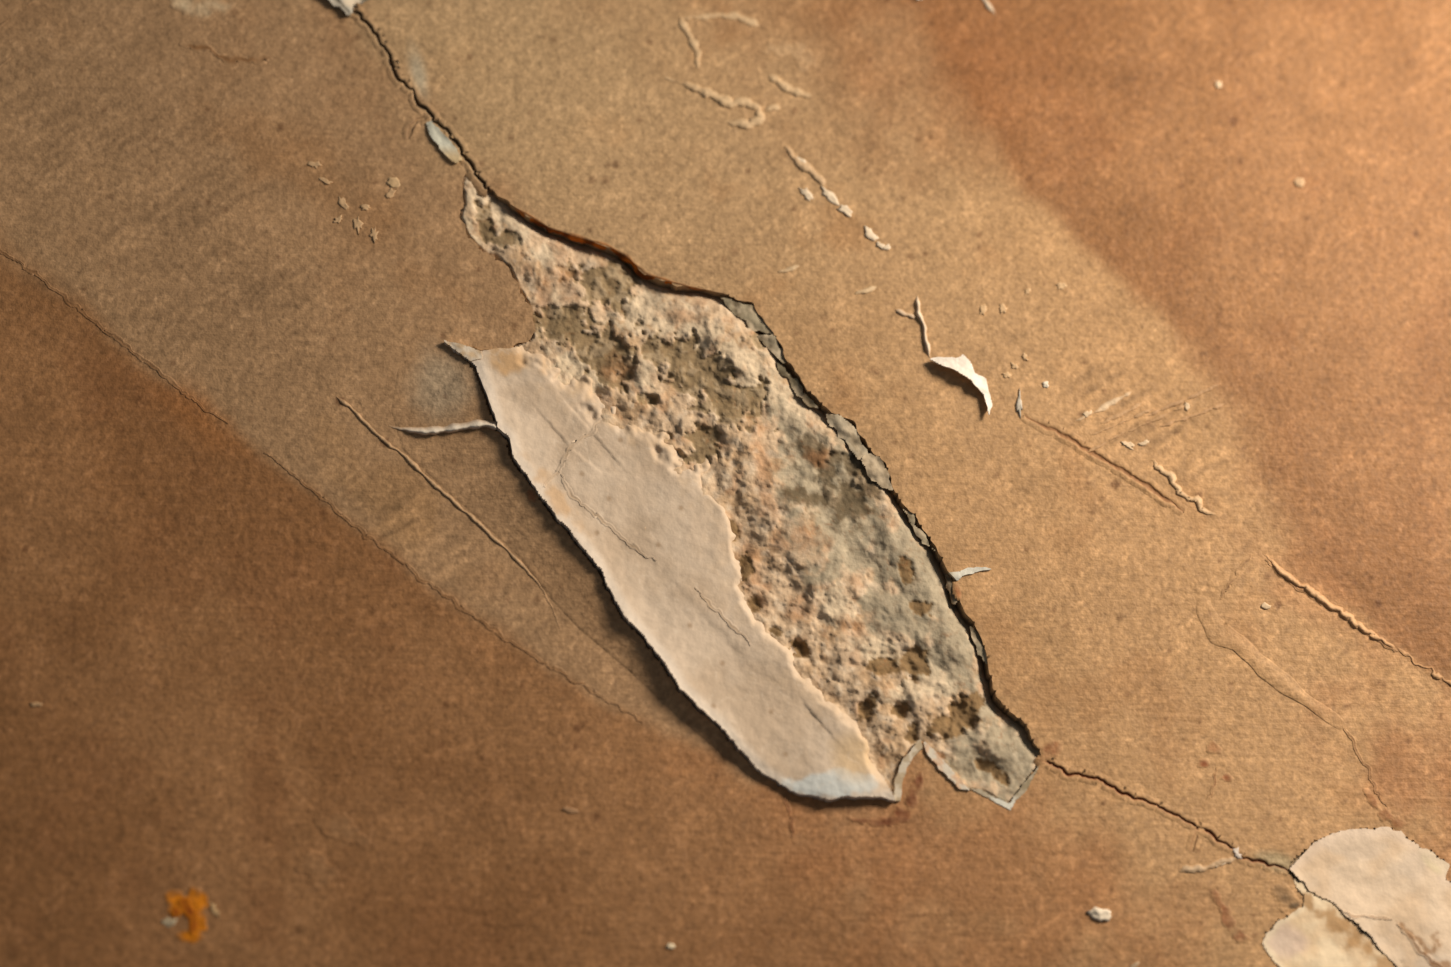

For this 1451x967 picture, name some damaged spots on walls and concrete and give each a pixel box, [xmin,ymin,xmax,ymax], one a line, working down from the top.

peeling [326,0,367,18]
crack [349,3,492,198]
peeling [785,145,891,250]
spalling [389,175,1039,810]
crack [1033,757,1290,877]
corrosion [161,886,220,945]
peeling [1262,826,1451,967]